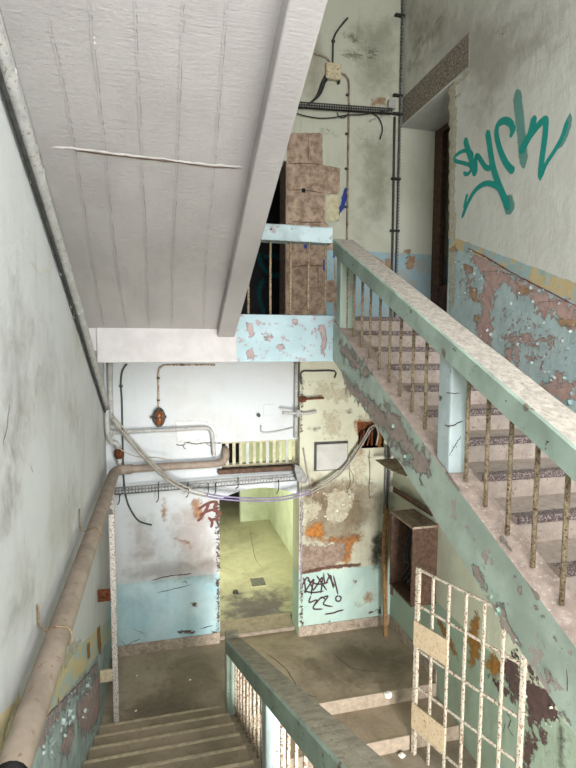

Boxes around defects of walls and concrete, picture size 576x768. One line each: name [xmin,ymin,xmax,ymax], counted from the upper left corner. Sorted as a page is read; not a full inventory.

crack [50,146,242,169]
flaking render [280,132,340,227]
flaking render [279,237,337,356]
peeling [448,87,576,407]
peeling [299,337,434,626]
rust [305,522,361,563]
water stain [372,532,382,566]
peeling [36,659,101,765]
peeling [471,563,571,768]